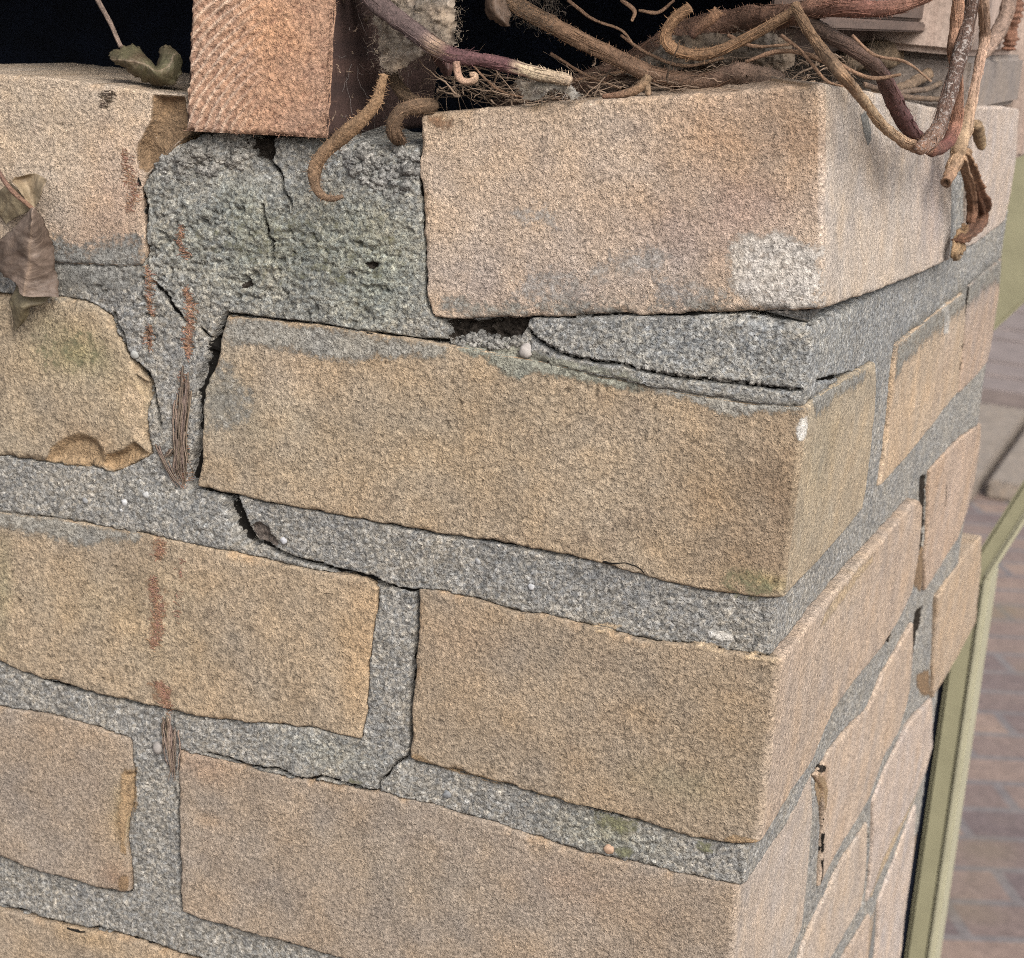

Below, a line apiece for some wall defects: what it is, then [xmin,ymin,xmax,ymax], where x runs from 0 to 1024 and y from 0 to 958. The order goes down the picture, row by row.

spalling [136,95,209,173]
crack [419,155,427,254]
crack [531,308,848,389]
spalling [45,384,150,471]
crack [157,280,450,592]
spalling [813,775,828,810]